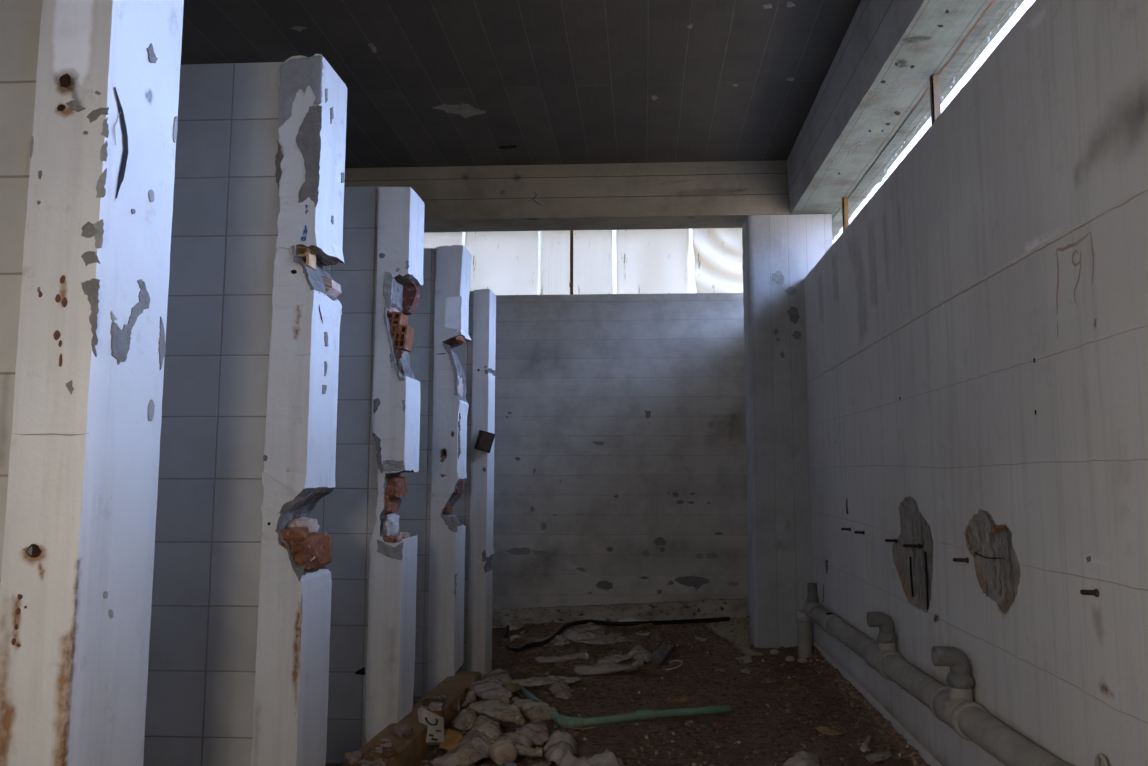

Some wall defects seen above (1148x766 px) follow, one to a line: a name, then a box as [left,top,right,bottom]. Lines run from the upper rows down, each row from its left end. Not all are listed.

flaking render [66,91,109,198]
flaking render [296,88,334,208]
flaking render [80,219,150,365]
flaking render [158,317,166,370]
peeling [442,336,467,396]
spalling [372,433,408,514]
spalling [275,496,333,581]
peeling [377,532,410,560]
spalling [892,496,933,613]
spalling [966,508,1021,614]
rust [11,594,27,647]
rust [0,685,13,755]